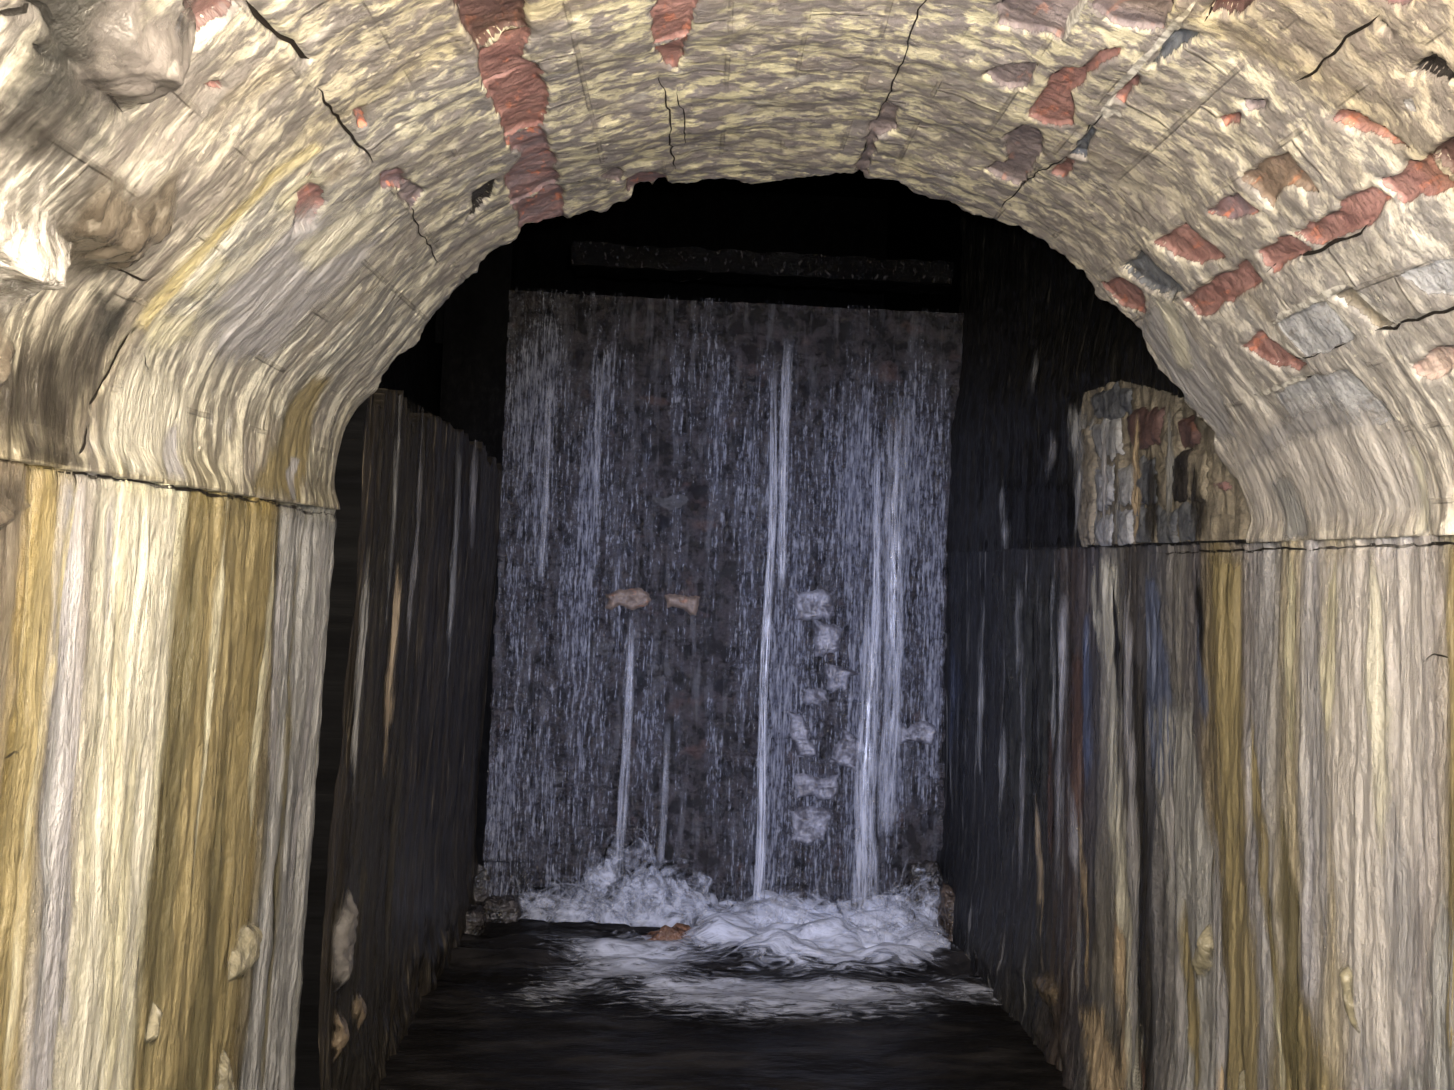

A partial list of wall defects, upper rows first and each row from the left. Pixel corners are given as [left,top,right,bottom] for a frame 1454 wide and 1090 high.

crack [26,331,333,515]
water stain [0,145,379,480]
spalling [176,0,232,32]
crack [246,0,373,162]
spalling [453,0,568,231]
spalling [983,47,1121,186]
spalling [1102,109,1454,317]
crack [1297,14,1380,81]
crack [1296,306,1454,378]
water stain [0,378,336,1090]
water stain [998,562,1330,1090]
water stain [1285,554,1454,1090]